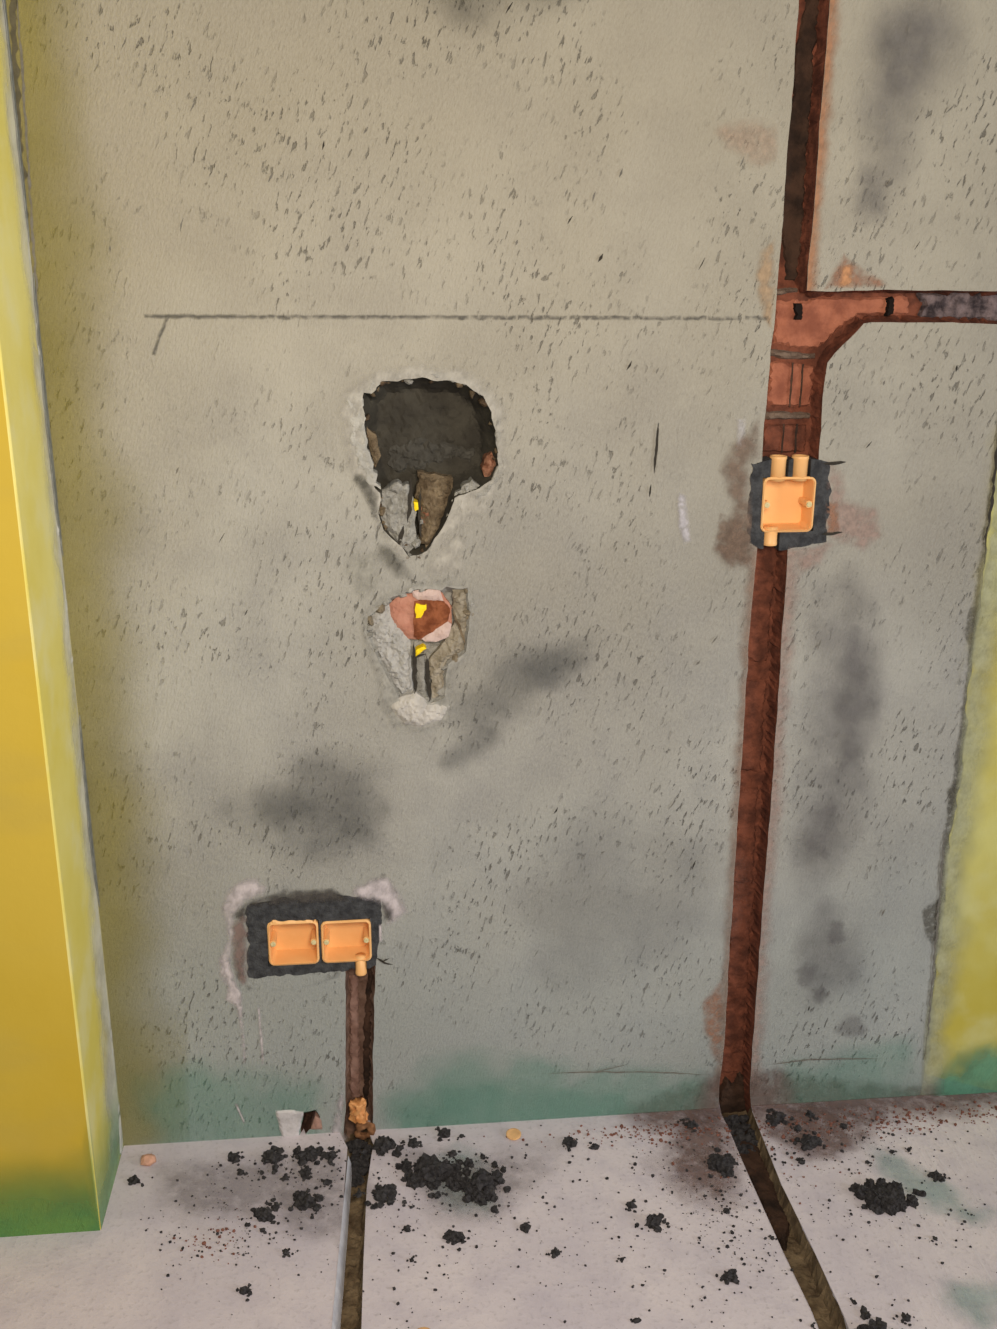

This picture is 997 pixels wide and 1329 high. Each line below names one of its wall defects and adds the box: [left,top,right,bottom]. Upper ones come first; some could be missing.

corrosion [807,0,836,291]
corrosion [833,261,881,286]
spalling [364,586,474,727]
spalling [345,372,502,559]
corrosion [717,438,757,725]
corrosion [750,552,795,1091]